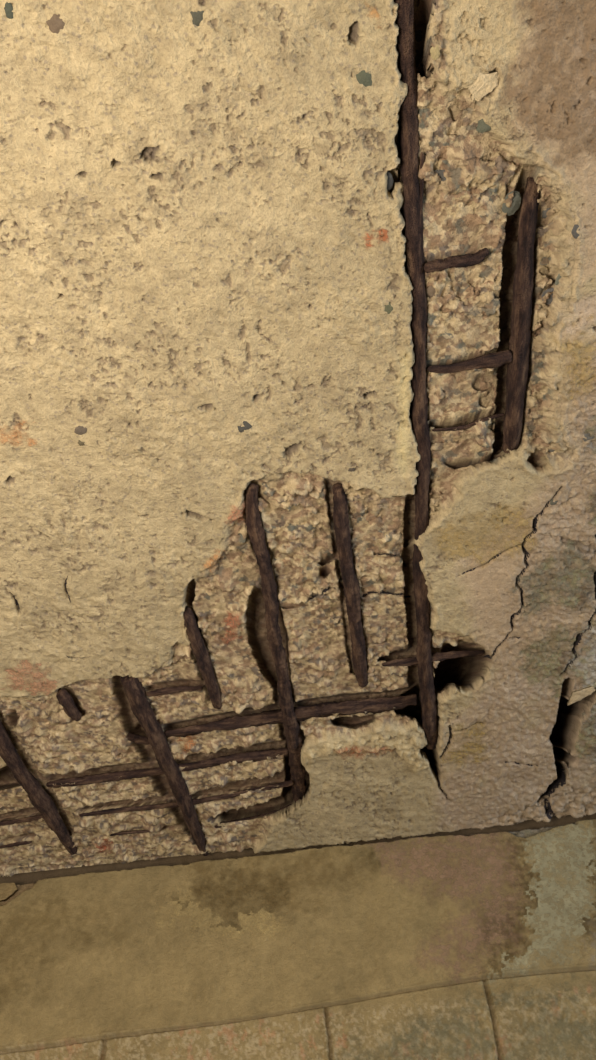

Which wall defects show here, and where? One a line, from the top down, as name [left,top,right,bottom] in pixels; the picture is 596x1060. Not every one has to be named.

flaking render [4,2,13,19]
flaking render [46,14,65,34]
flaking render [190,11,204,26]
spalling [348,21,359,43]
flaking render [356,70,372,87]
spalling [141,146,159,161]
spalling [386,0,580,540]
flaking render [74,426,87,446]
crack [462,488,560,659]
crack [562,571,596,673]
spalling [0,471,487,877]
leakage [371,824,596,973]